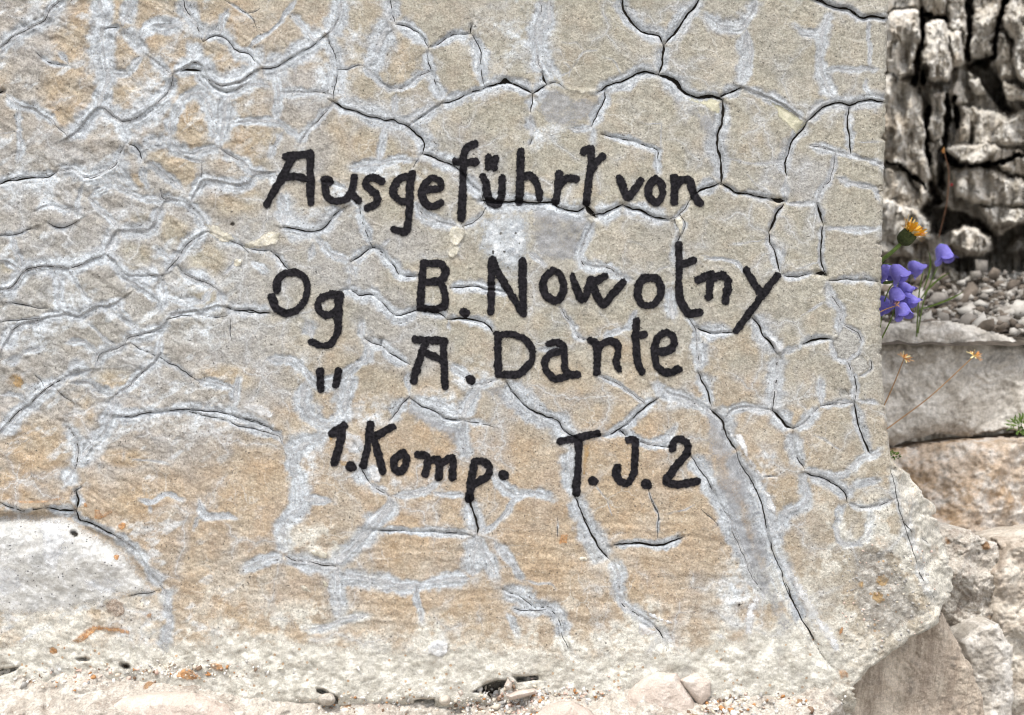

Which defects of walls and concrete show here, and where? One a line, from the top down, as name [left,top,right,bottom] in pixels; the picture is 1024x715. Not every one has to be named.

crack [0,0,573,503]
crack [417,0,934,660]
crack [2,427,131,546]
crack [131,581,172,648]
crack [242,442,568,647]